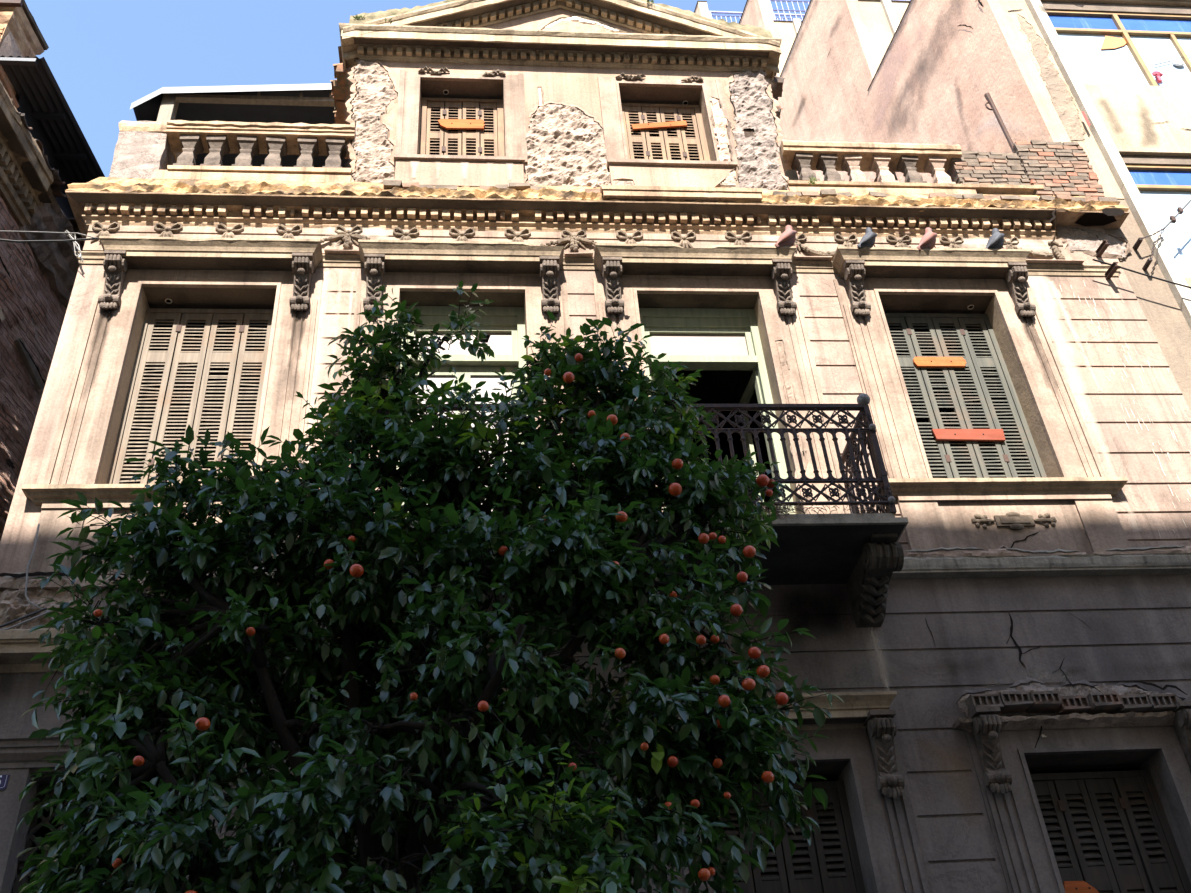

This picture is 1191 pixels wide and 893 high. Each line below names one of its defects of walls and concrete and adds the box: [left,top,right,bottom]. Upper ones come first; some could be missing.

spalling [345,59,399,183]
spalling [524,87,635,188]
spalling [709,69,789,190]
spalling [0,572,90,630]
crack [1006,612,1101,692]
crack [1133,681,1188,695]